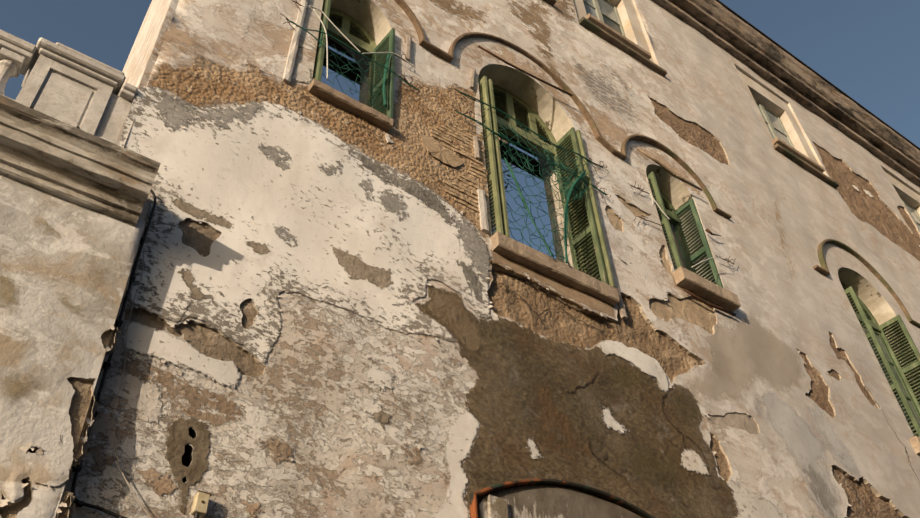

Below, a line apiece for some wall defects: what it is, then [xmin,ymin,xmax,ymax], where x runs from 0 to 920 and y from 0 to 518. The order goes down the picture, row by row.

flaking render [812,141,920,261]
peeling [101,55,842,495]
flaking render [829,331,882,411]
flaking render [20,442,43,455]
flaking render [67,377,121,471]
flaking render [0,478,33,518]
flaking render [55,491,76,518]
flaking render [803,465,909,518]